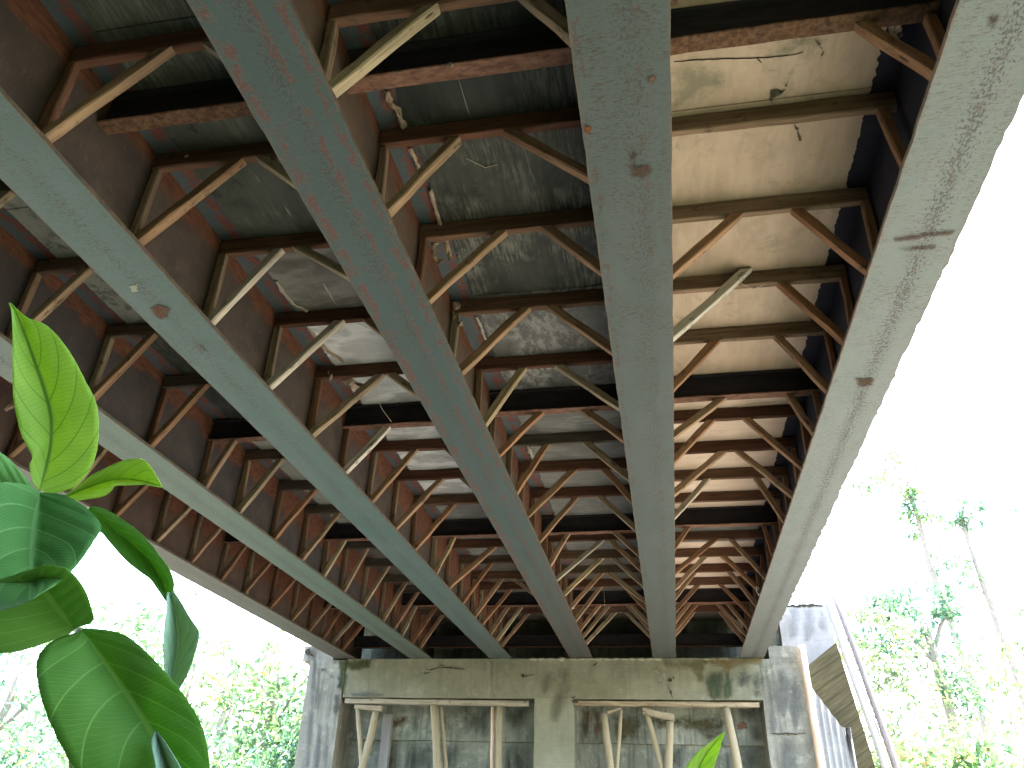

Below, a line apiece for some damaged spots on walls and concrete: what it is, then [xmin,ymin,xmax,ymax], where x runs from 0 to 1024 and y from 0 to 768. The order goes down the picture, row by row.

crack [674,52,803,62]
corrosion [895,231,953,251]
damp [689,662,757,700]